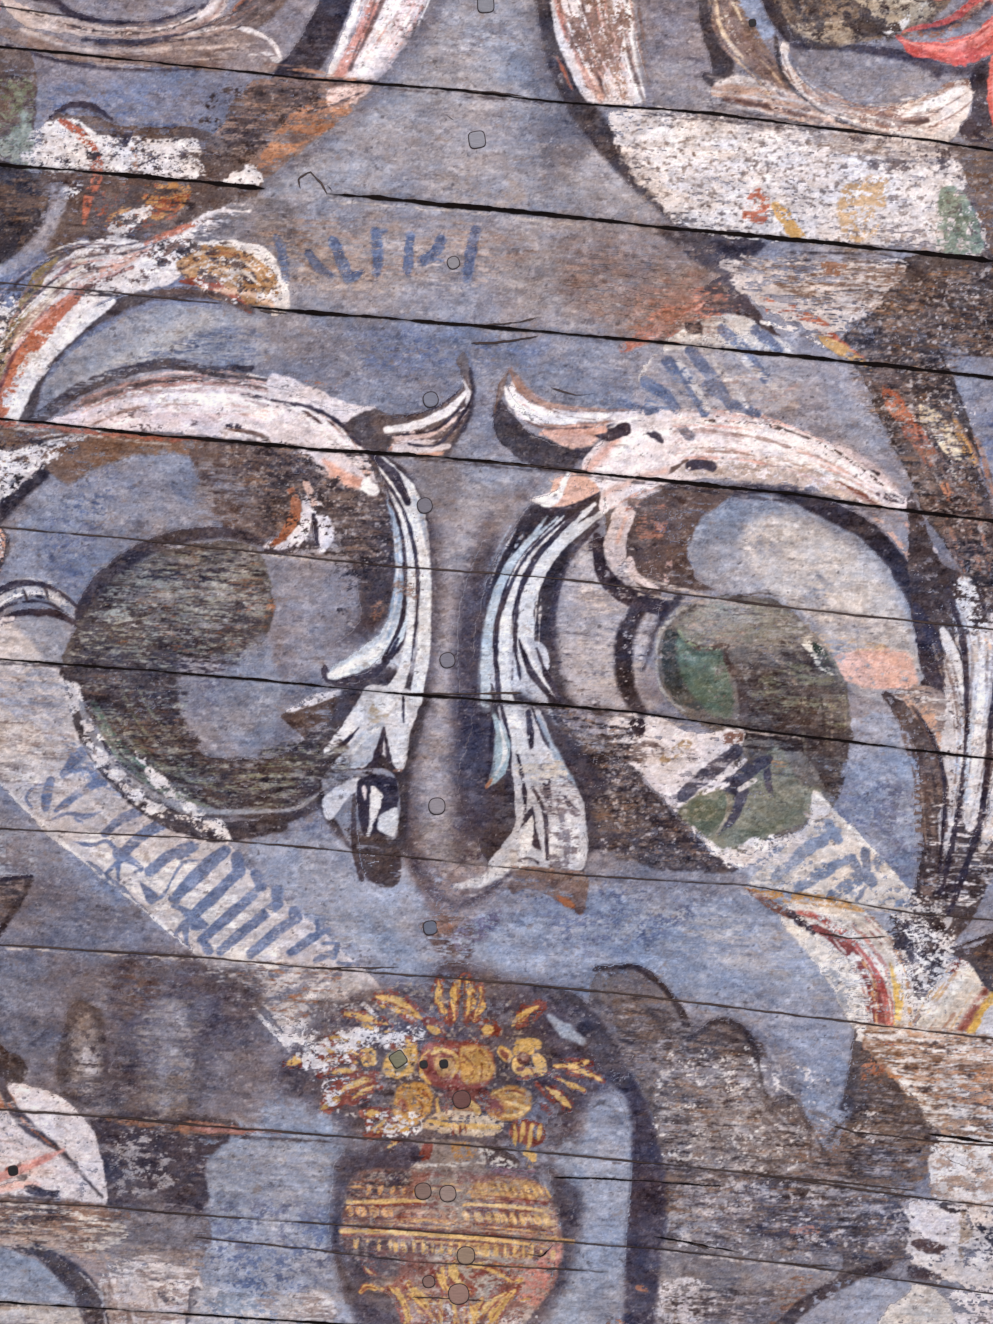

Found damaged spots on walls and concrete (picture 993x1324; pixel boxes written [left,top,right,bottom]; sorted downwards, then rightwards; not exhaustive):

crack [0,282,993,379]
peeling [828,912,993,1324]